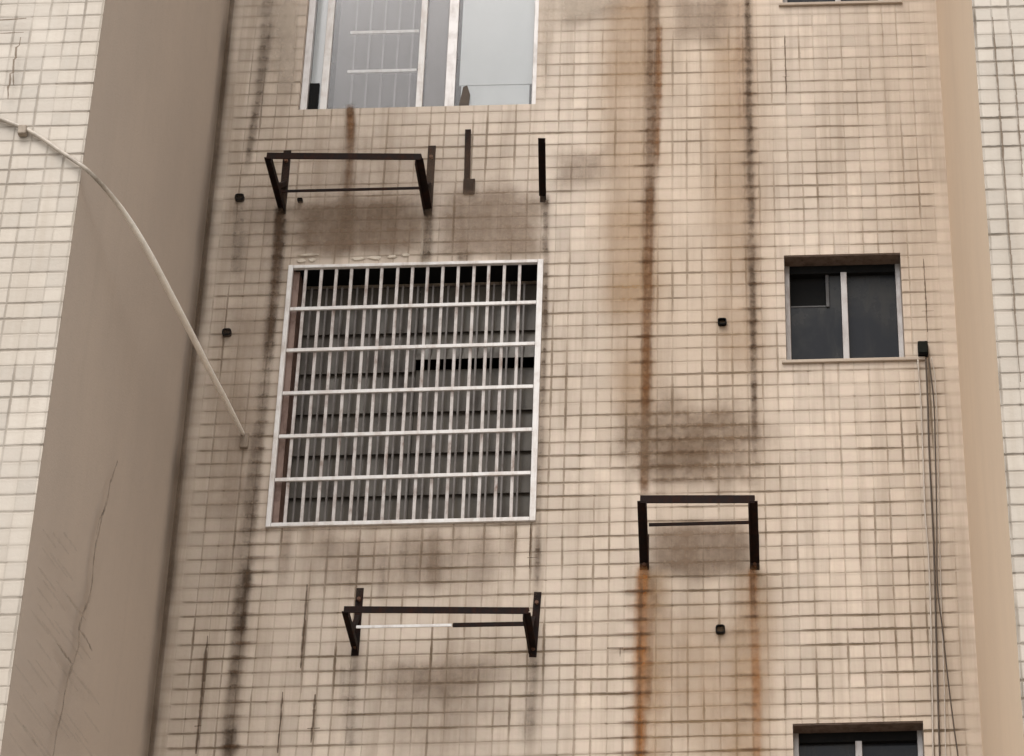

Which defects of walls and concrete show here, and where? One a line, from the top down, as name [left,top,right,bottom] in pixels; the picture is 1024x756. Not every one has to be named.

leakage [219,3,231,106]
leakage [247,25,270,152]
corrosion [617,0,661,312]
leakage [187,140,220,395]
leakage [159,416,187,656]
leakage [246,394,266,531]
leakage [625,410,753,482]
leakage [148,702,157,756]
leakage [223,583,249,750]
corrosion [621,569,657,756]